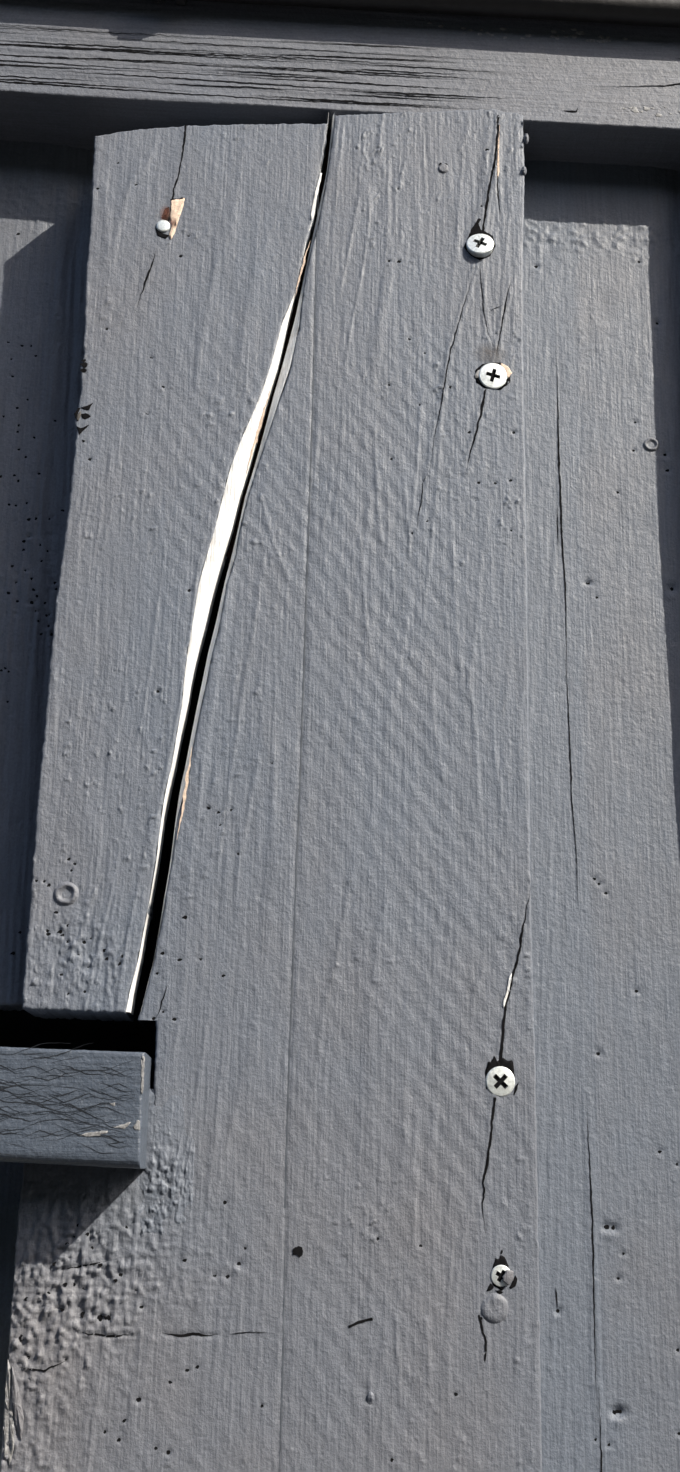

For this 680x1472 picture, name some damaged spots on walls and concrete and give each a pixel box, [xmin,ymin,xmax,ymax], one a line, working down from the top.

spalling [155,197,190,258]
crack [0,24,523,1018]
crack [556,356,579,905]
crack [499,889,531,1062]
crack [0,1043,136,1155]
crack [482,1097,496,1234]
crack [478,1315,487,1361]